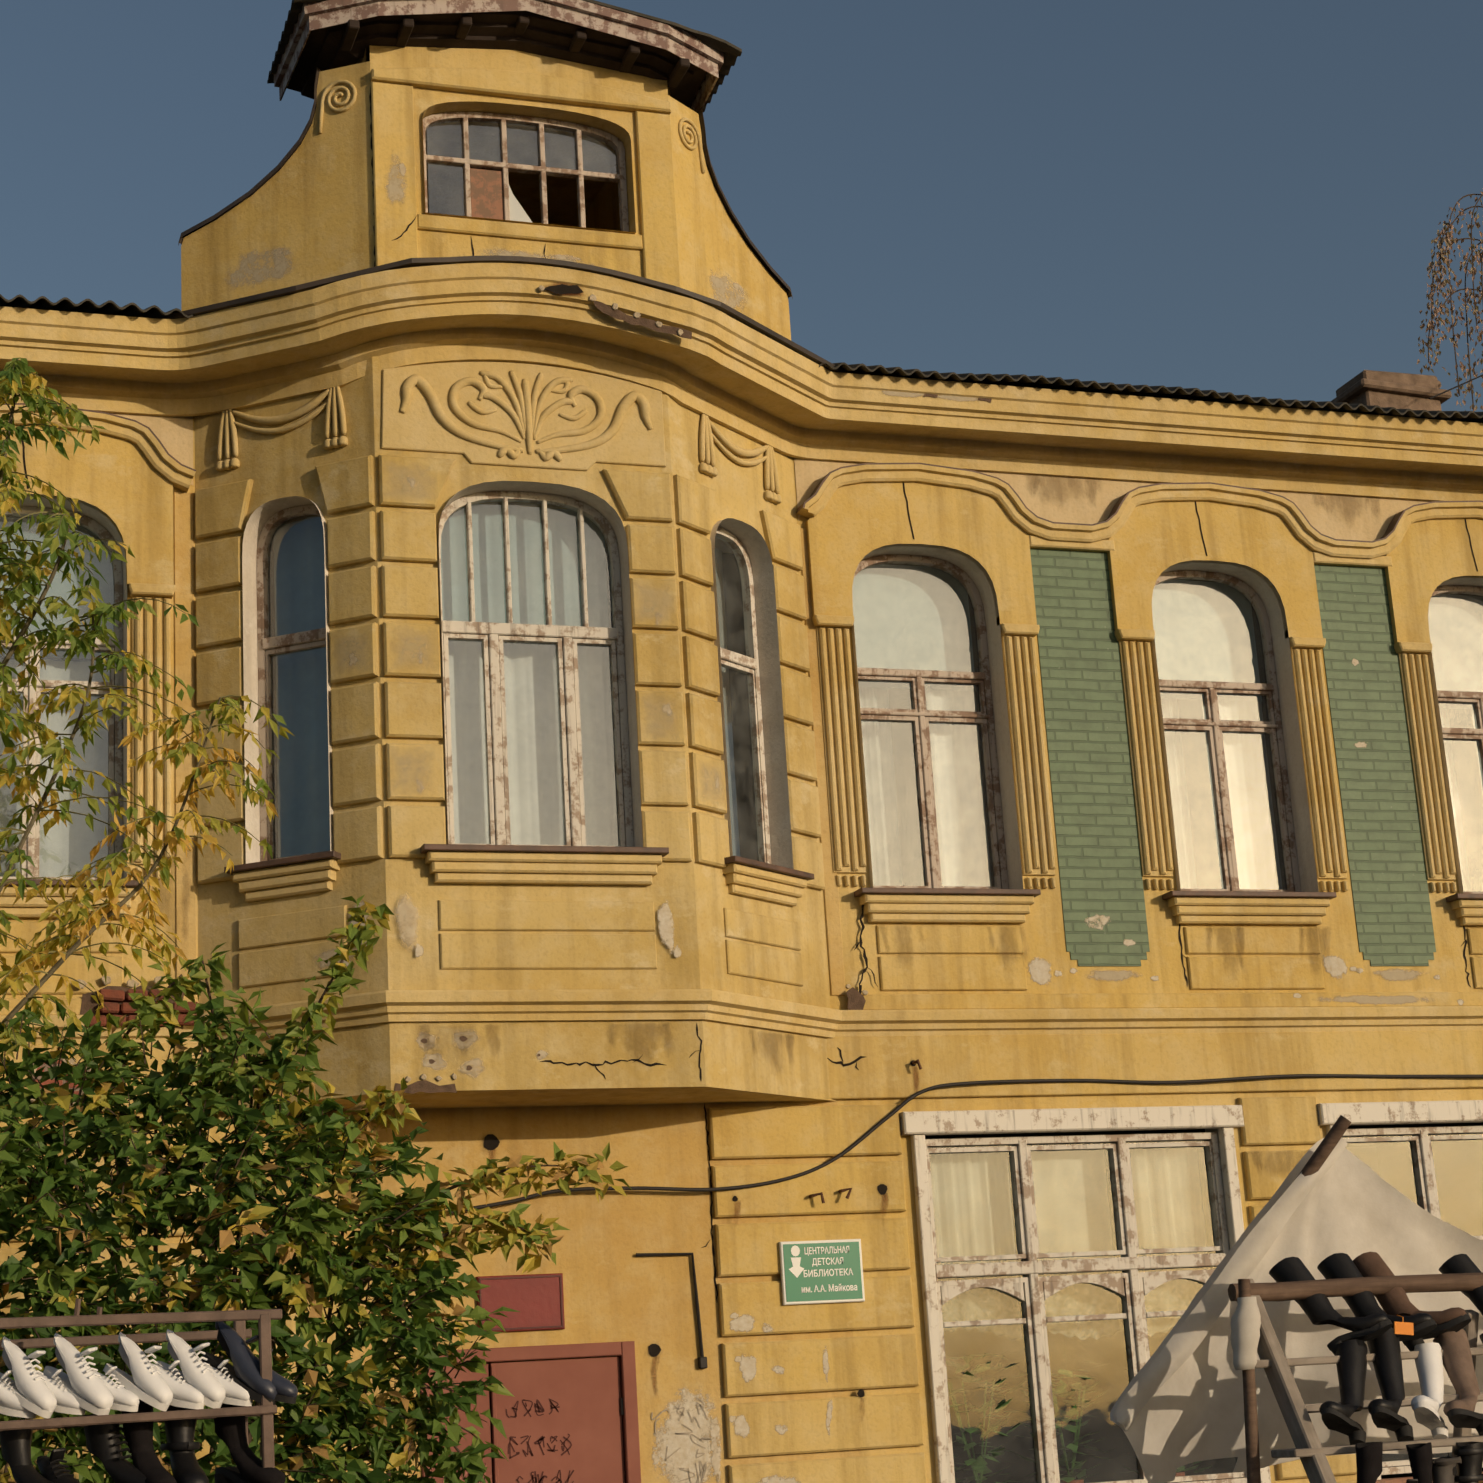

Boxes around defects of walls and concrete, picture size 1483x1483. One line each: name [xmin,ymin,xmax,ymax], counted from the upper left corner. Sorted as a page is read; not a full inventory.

spalling [589,294,692,339]
peeling [396,896,424,957]
peeling [657,903,681,957]
crack [854,905,878,993]
peeling [1027,957,1159,985]
spalling [394,1031,484,1094]
crack [827,1047,865,1070]
crack [540,1026,718,1300]
peeling [730,1313,773,1332]
peeling [652,1388,750,1483]